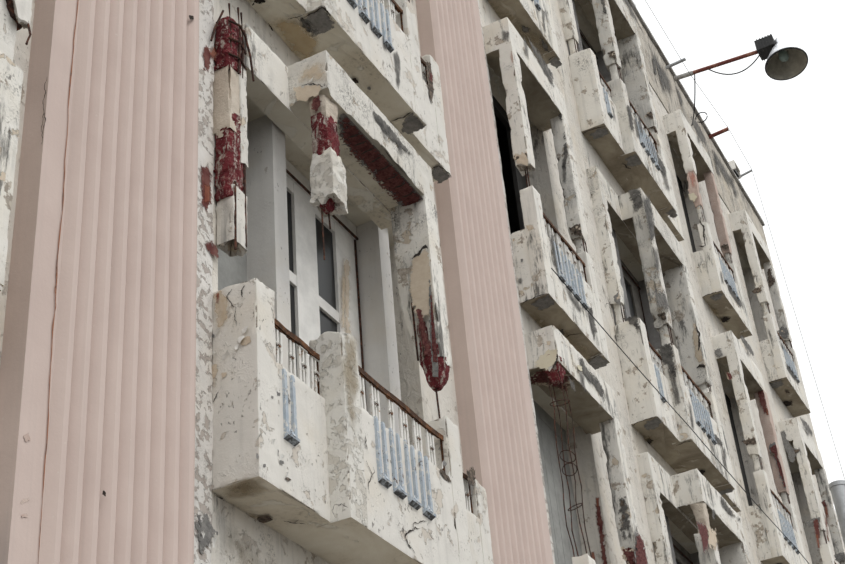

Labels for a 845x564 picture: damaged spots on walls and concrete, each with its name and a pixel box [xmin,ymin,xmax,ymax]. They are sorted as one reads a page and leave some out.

spalling [300,6,335,37]
corrosion [203,46,217,71]
spalling [337,112,424,206]
corrosion [201,166,212,212]
corrosion [205,241,219,258]
peeling [408,245,439,377]
spalling [530,341,592,558]
spalling [621,527,648,564]